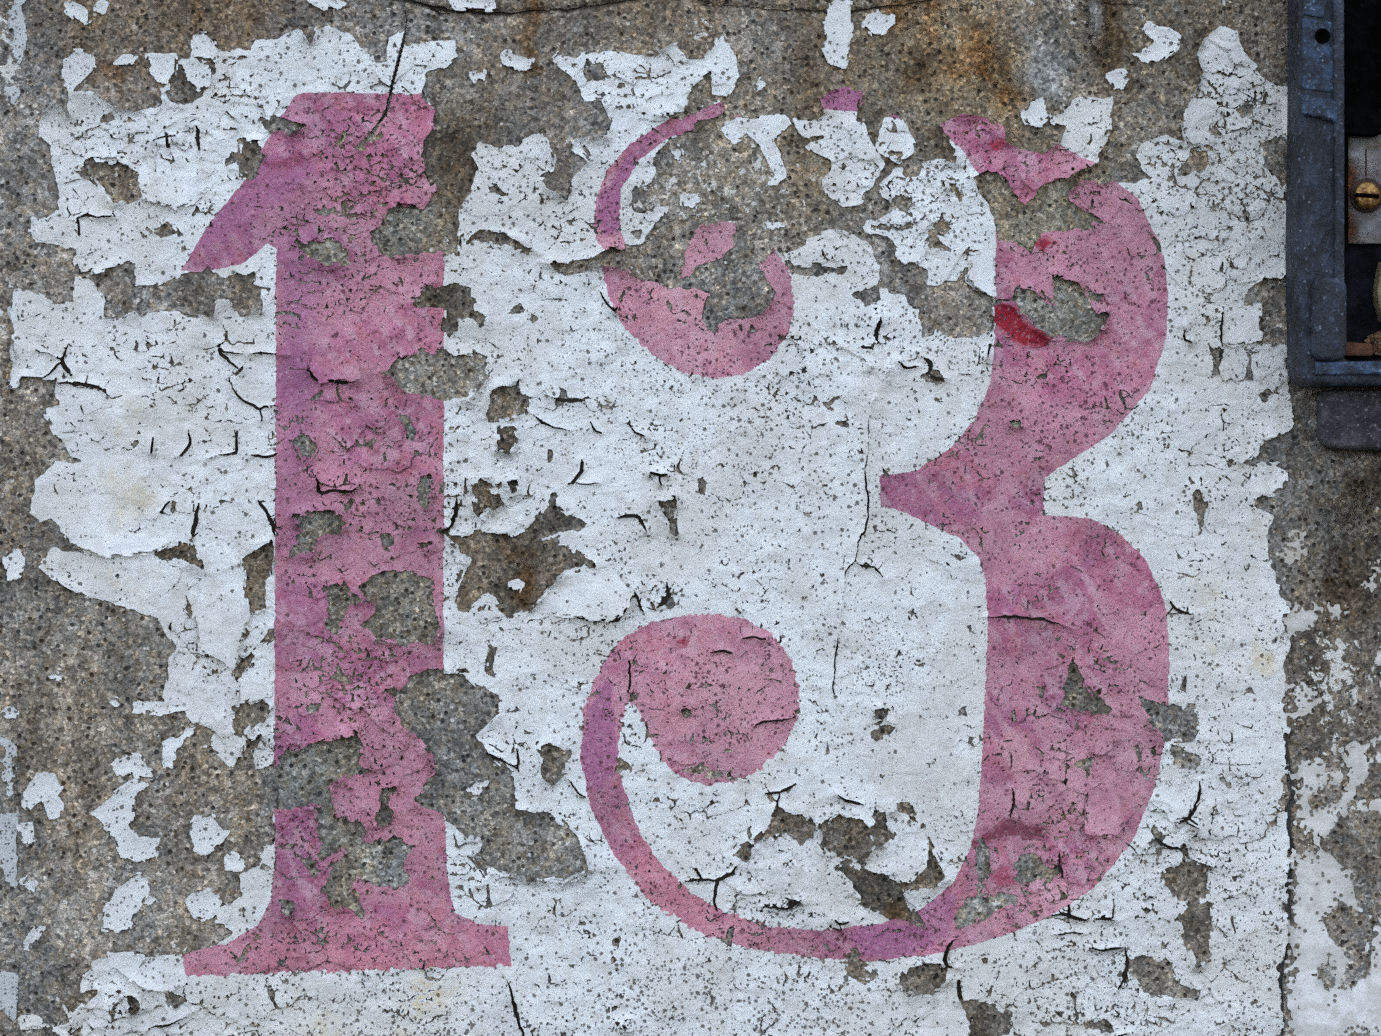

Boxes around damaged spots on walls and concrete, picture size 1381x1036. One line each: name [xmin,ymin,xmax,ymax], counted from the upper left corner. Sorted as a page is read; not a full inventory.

peeling [113,32,220,92]
crack [376,0,637,126]
crack [700,0,932,13]
peeling [821,0,895,69]
peeling [611,118,821,335]
peeling [869,167,1120,348]
peeling [1,48,634,1015]
crack [501,969,525,1036]
peeling [723,801,947,942]
crack [943,936,962,999]
peeling [1123,843,1217,1002]
peeling [1290,638,1381,989]